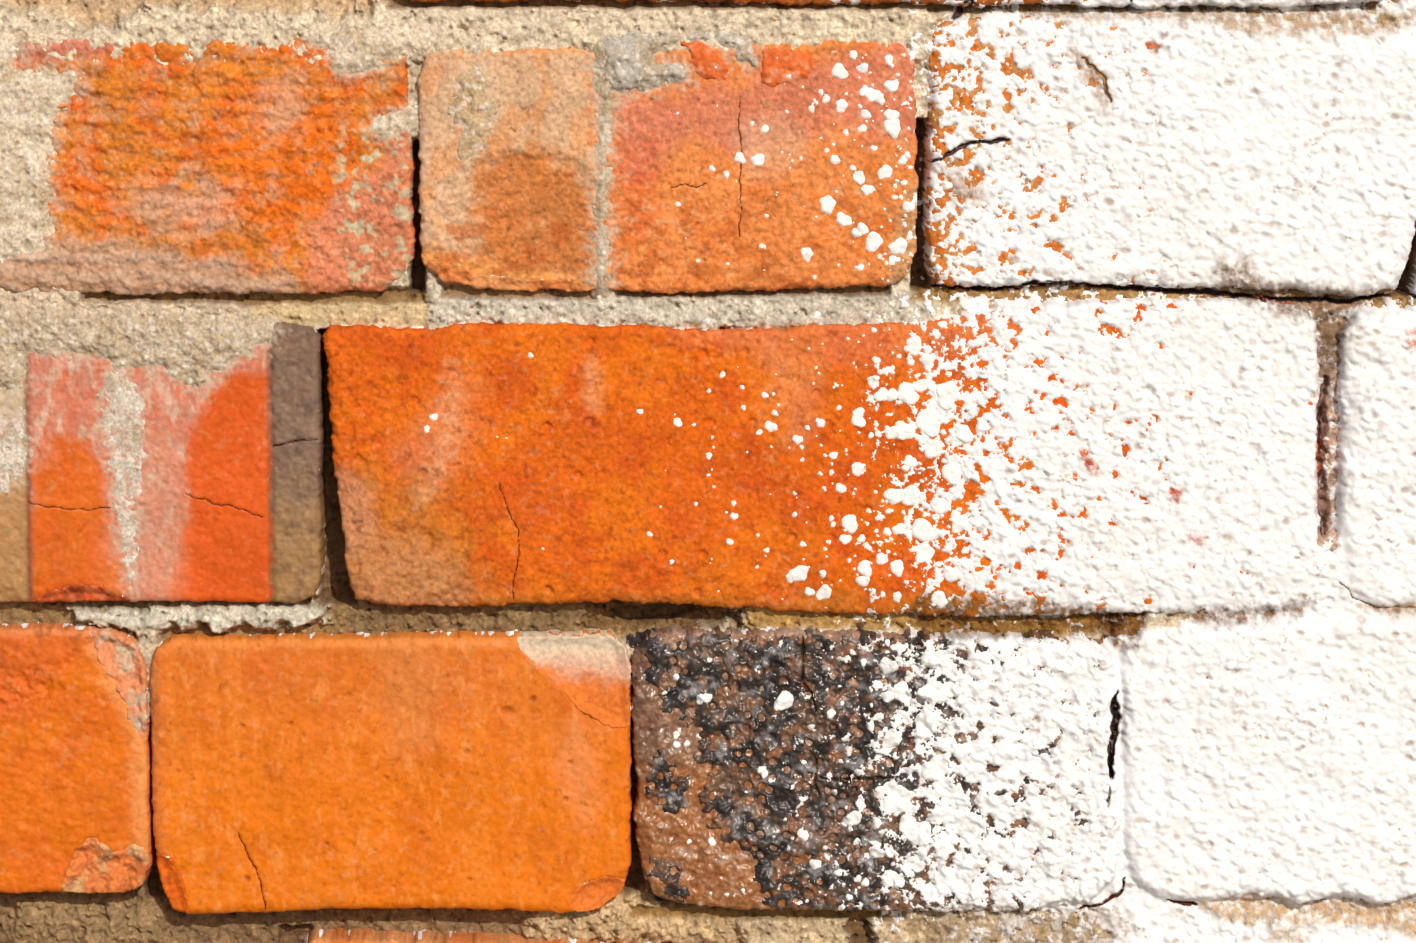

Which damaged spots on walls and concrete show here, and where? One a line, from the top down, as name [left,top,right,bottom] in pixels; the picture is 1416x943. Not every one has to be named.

crack [952,0,973,19]
crack [1107,691,1120,805]